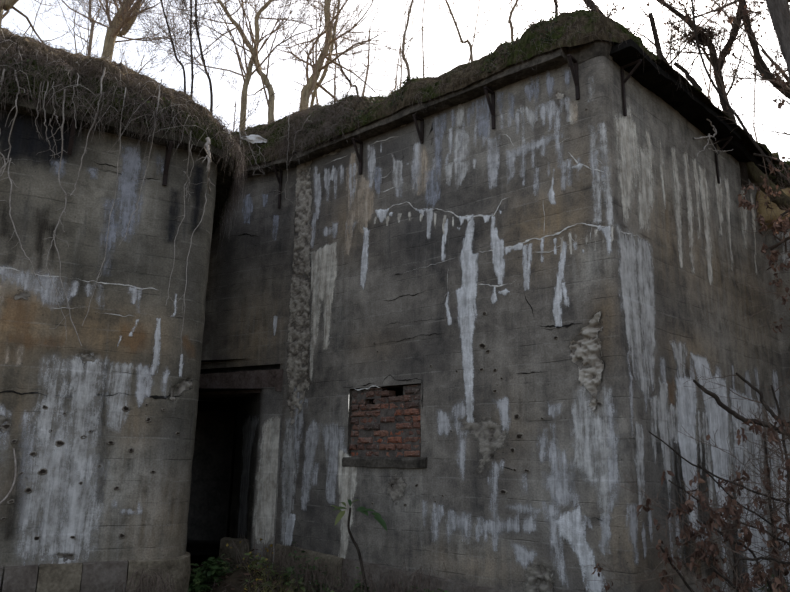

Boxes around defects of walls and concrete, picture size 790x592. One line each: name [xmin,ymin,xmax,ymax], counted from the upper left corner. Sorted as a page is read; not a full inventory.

crack [0,384,73,398]
leakage [5,318,184,564]
crack [95,380,192,399]
leakage [238,389,357,558]
spalling [286,160,313,426]
leakage [310,70,579,379]
leakage [437,217,478,478]
spalling [450,412,524,474]
leakage [422,387,618,592]
crack [484,205,638,262]
spalling [569,311,604,411]
leakage [586,109,790,592]